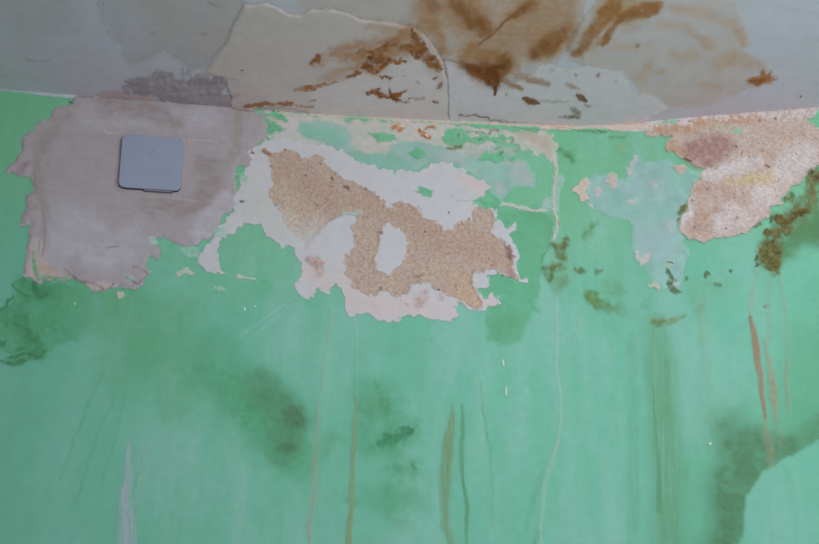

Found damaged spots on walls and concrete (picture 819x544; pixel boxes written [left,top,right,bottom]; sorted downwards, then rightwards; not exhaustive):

corrosion [331,0,662,102]
damp [521,0,774,106]
peeling [183,3,819,323]
damp [755,168,819,274]
corrosion [749,316,776,419]
damp [712,429,798,544]